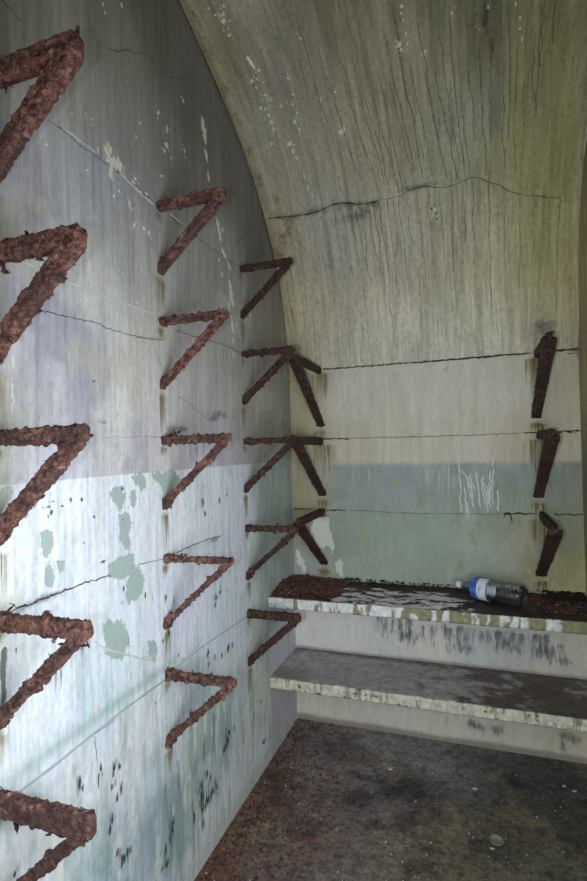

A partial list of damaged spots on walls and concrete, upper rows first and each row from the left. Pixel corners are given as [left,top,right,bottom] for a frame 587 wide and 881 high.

crack [53,0,566,302]
crack [321,353,529,370]
damp [425,433,499,519]
peeling [40,529,65,588]
peeling [108,455,181,605]
crack [139,535,221,565]
peeling [294,549,306,573]
peeling [310,516,344,578]
crack [10,575,111,610]
peeling [103,618,129,661]
peeling [148,639,158,662]
damp [194,769,218,828]